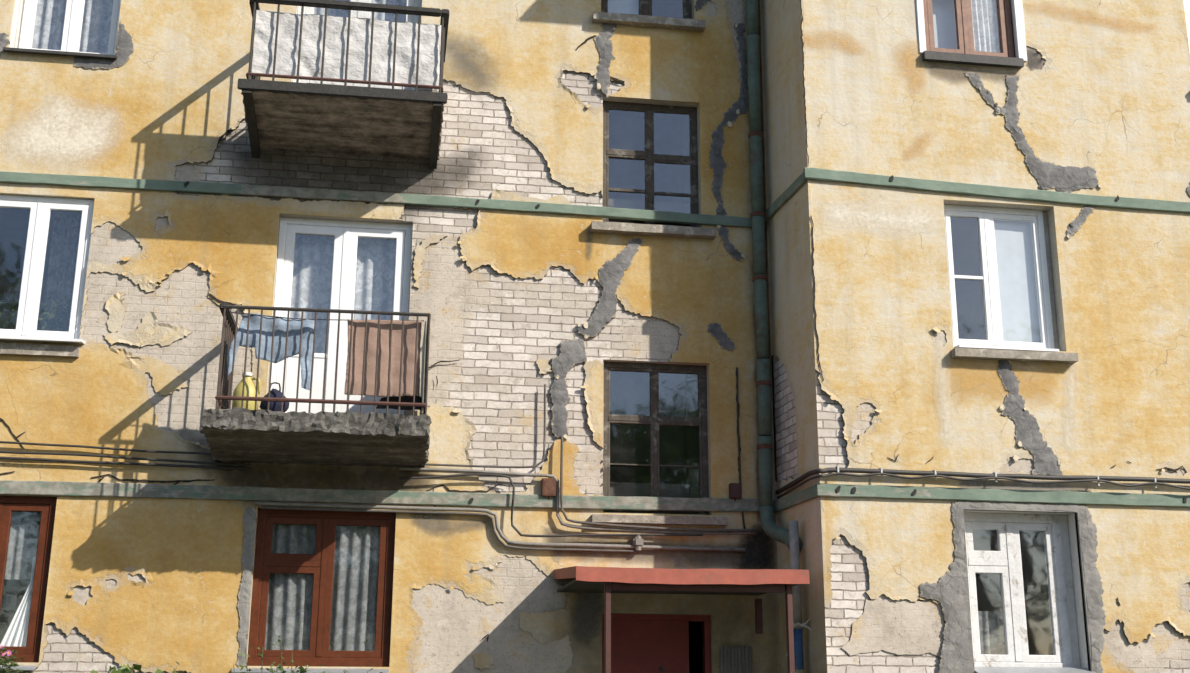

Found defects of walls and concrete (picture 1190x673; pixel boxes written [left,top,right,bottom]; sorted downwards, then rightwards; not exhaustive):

crack [576,23,625,97]
crack [709,23,748,262]
crack [965,72,1102,239]
flaking render [80,222,253,446]
flaking render [175,77,681,496]
crack [549,238,643,440]
crack [0,418,26,475]
flaking render [815,371,882,468]
crack [997,360,1062,475]
flaking render [3,622,191,673]
flaking render [411,555,574,673]
flaking render [825,535,945,673]